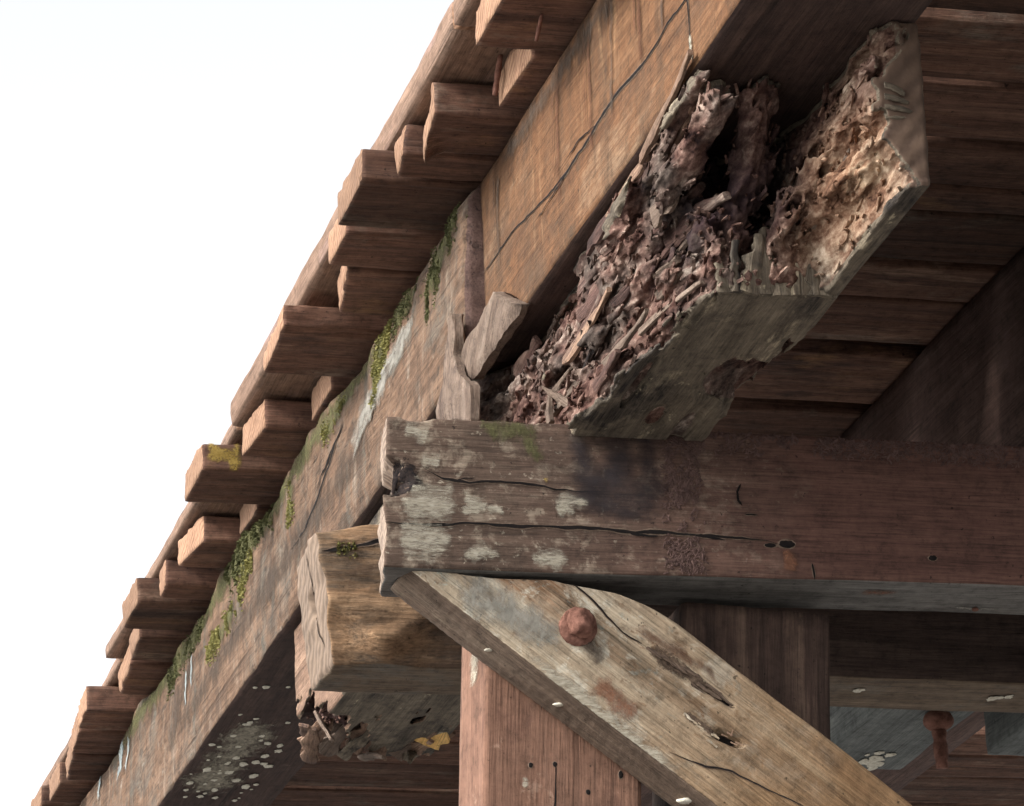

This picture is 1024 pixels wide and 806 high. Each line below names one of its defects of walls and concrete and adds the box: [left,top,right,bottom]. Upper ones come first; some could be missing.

peeling [714,227,833,297]
peeling [541,386,569,424]
crack [292,420,777,646]
peeling [297,710,369,764]
peeling [413,731,456,761]
crack [670,752,803,806]